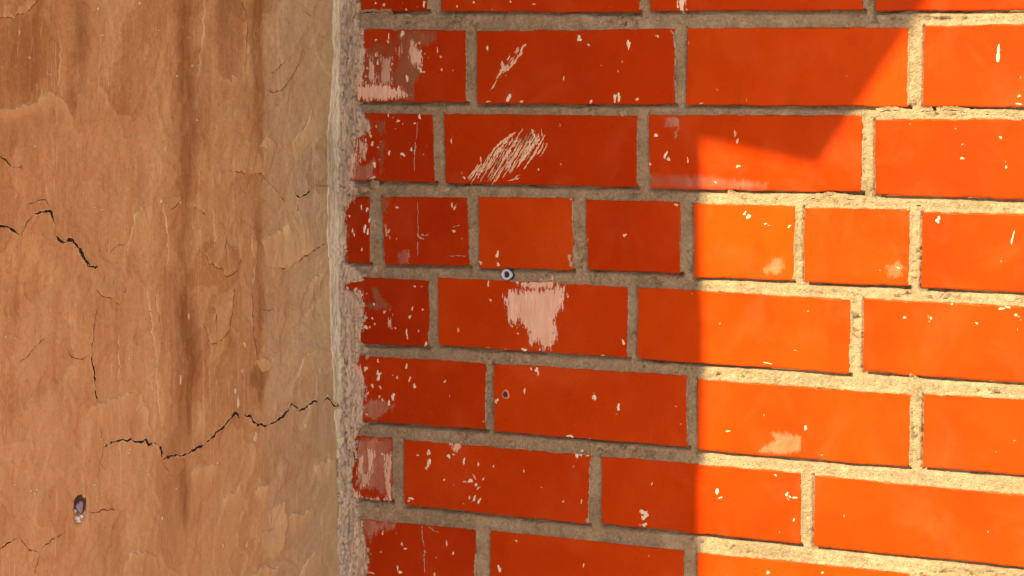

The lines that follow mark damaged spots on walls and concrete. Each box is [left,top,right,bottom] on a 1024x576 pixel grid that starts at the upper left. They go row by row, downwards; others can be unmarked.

crack [0,197,126,271]
crack [18,303,340,479]